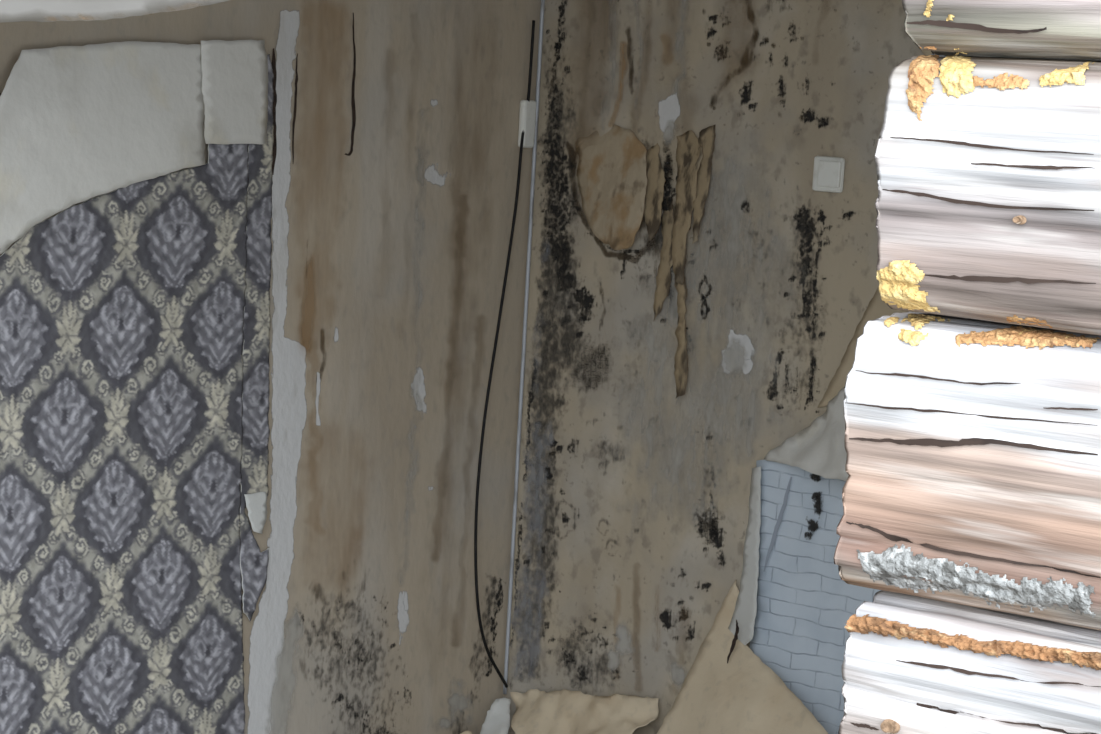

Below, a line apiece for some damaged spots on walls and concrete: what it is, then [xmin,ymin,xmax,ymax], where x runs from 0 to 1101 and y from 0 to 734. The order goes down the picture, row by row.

leakage [703,11,729,61]
leakage [726,6,788,84]
leakage [739,81,756,111]
leakage [801,109,829,128]
leakage [689,161,762,322]
leakage [471,0,677,682]
leakage [689,351,819,453]
leakage [289,601,395,689]
leakage [335,694,389,734]